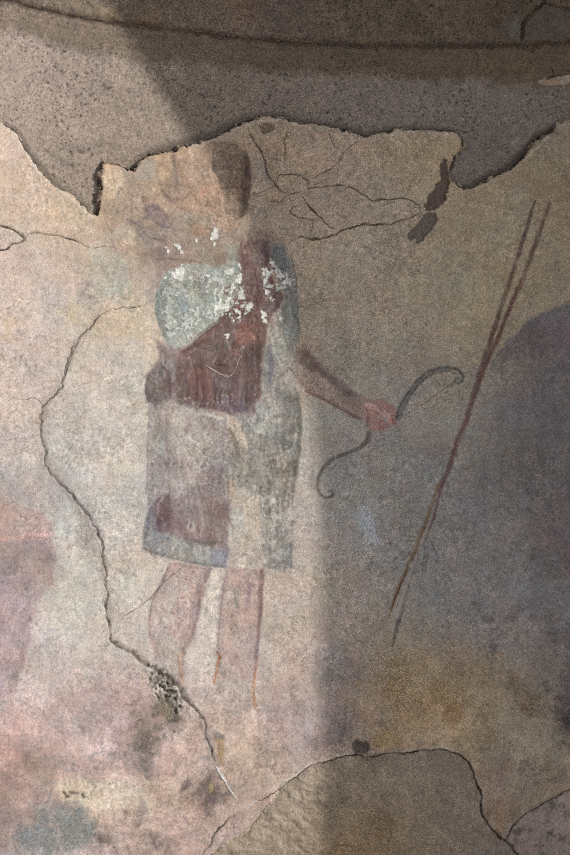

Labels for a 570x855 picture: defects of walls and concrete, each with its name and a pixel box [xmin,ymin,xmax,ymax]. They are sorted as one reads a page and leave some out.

crack [95,138,212,215]
flaking render [0,27,570,244]
crack [237,116,472,241]
crack [494,130,553,177]
crack [0,225,24,251]
peeling [162,244,267,341]
peeling [261,259,293,300]
crack [40,306,140,462]
crack [59,484,141,661]
crack [161,671,195,709]